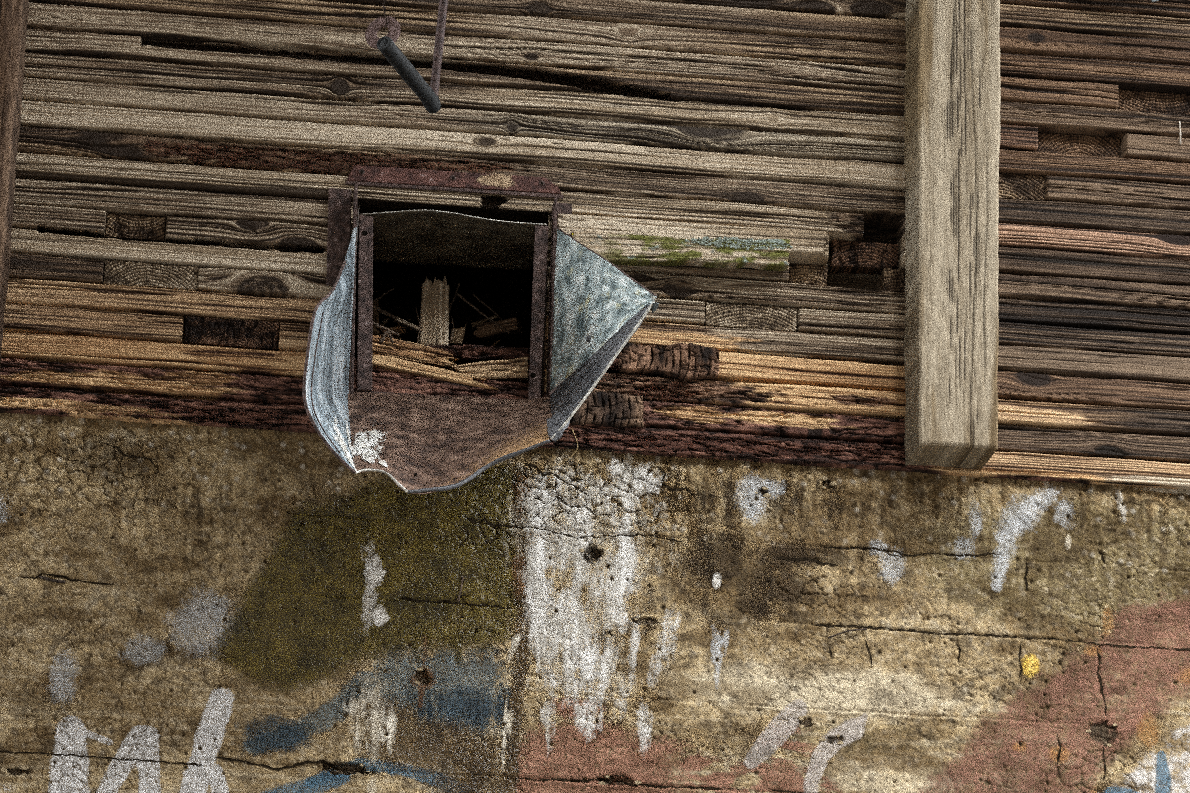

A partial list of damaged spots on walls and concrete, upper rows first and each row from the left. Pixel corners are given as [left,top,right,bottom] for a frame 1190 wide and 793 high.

water stain [995,492,1053,590]
water stain [350,461,655,793]
water stain [657,620,678,671]
crack [812,624,1190,715]
crack [0,750,370,774]
crack [1057,734,1065,775]